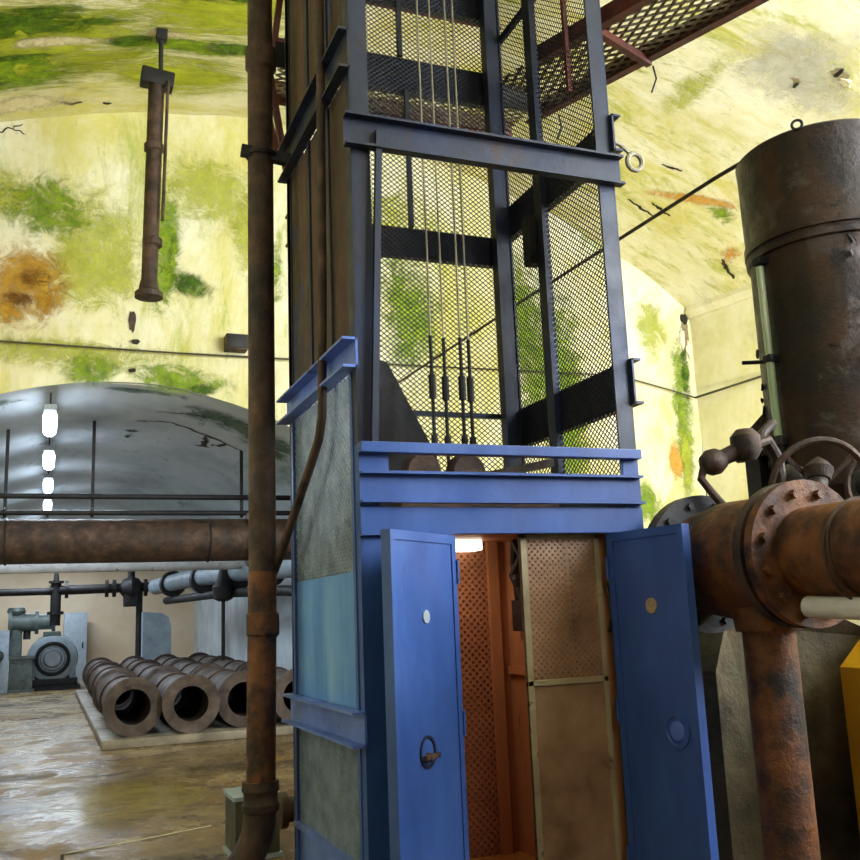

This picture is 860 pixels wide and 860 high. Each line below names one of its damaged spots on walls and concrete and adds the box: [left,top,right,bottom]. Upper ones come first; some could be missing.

water stain [12,6,122,26]
water stain [105,35,154,47]
water stain [207,44,247,55]
corrosion [0,249,69,322]
water stain [681,351,690,393]
water stain [681,433,692,484]